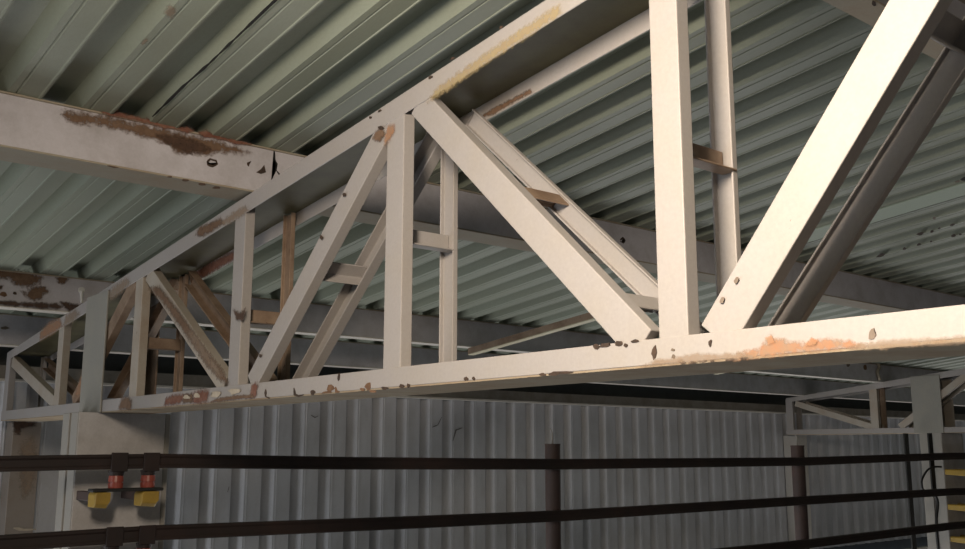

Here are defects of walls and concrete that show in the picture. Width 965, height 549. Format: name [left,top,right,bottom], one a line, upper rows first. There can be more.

corrosion [63,110,251,155]
corrosion [151,286,229,383]
peeling [593,339,639,350]
peeling [164,384,270,406]
peeling [293,373,340,397]
peeling [360,383,410,393]